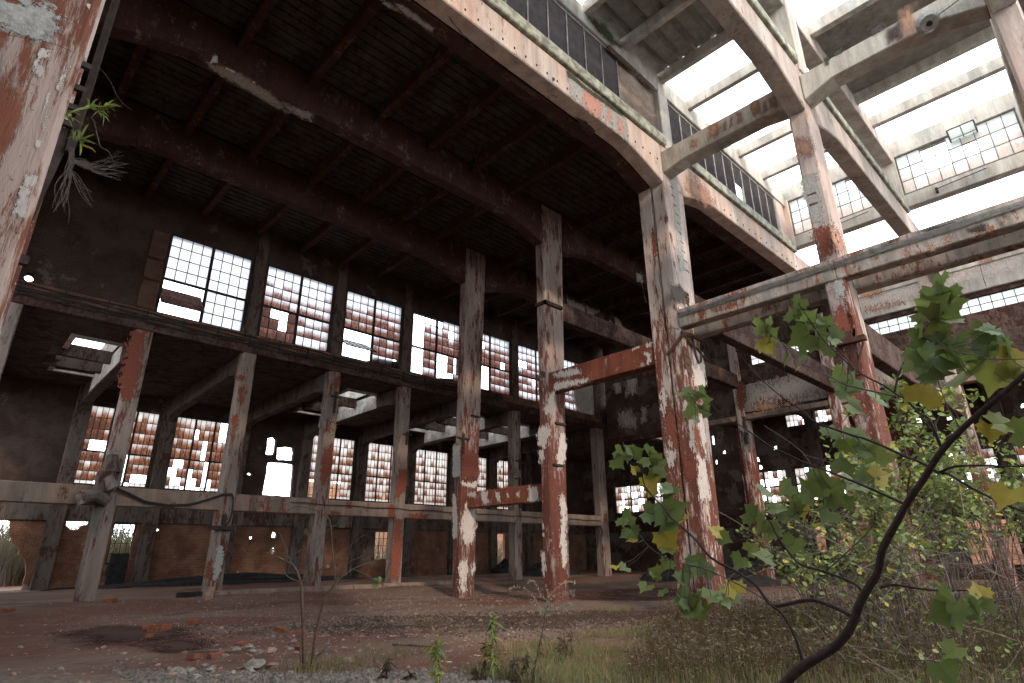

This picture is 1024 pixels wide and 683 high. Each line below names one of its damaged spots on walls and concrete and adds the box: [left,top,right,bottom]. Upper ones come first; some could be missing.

spalling [0,0,72,85]
peeling [35,66,69,148]
peeling [12,174,38,217]
peeling [651,228,659,267]
rust [809,222,846,263]
peeling [536,367,589,471]
peeling [602,342,827,504]
peeling [540,494,569,577]